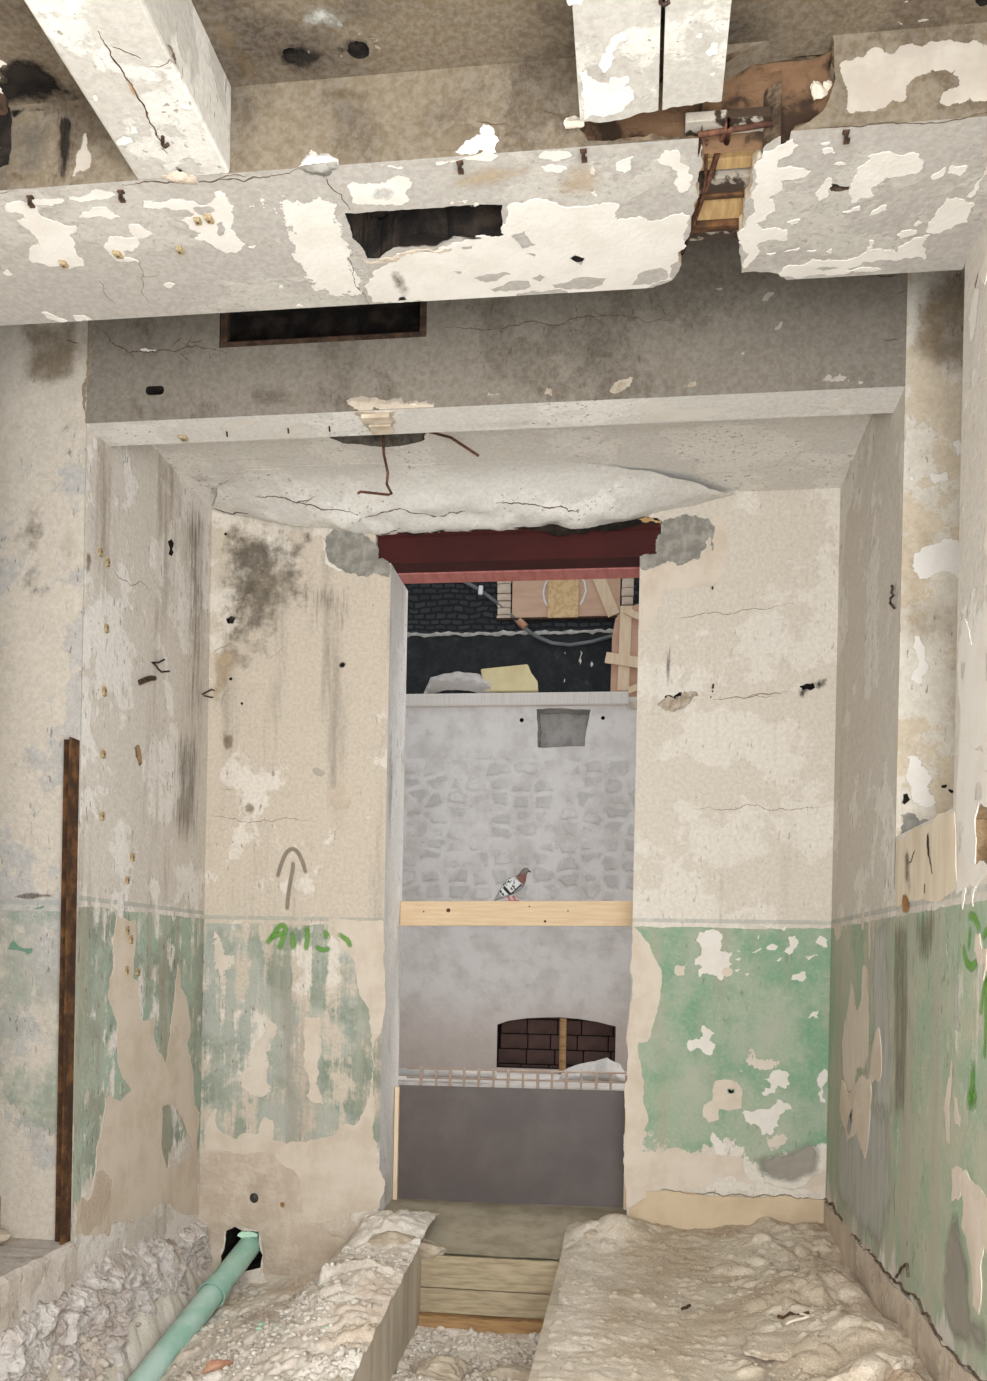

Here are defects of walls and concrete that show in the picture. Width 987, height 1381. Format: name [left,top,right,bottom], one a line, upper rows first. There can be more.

peeling [5,189,152,269]
crack [98,31,350,210]
peeling [143,32,987,303]
spalling [330,396,479,496]
damp [232,535,296,633]
crack [676,603,791,619]
crack [712,692,781,700]
peeling [956,607,987,910]
peeling [0,903,386,1381]
flaking render [623,906,978,1381]
crack [661,1189,982,1381]
spalling [951,1166,987,1315]